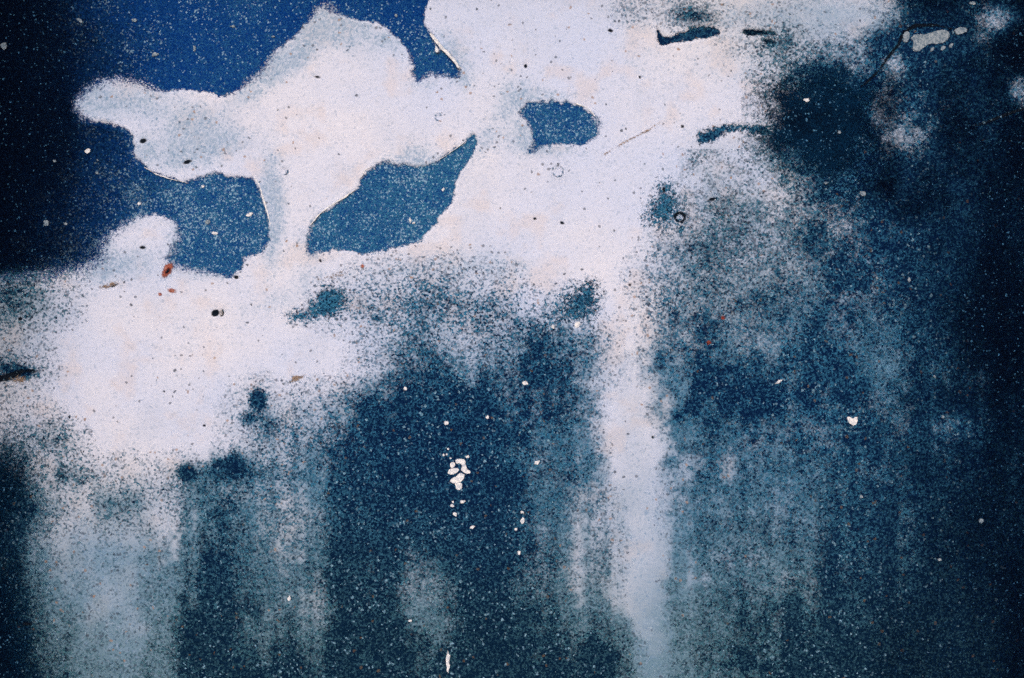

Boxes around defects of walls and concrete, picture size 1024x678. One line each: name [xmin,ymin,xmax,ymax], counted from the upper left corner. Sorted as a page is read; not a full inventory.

peeling [656,26,720,46]
peeling [0,0,477,282]
peeling [518,99,601,154]
peeling [696,123,770,145]
peeling [443,448,471,516]